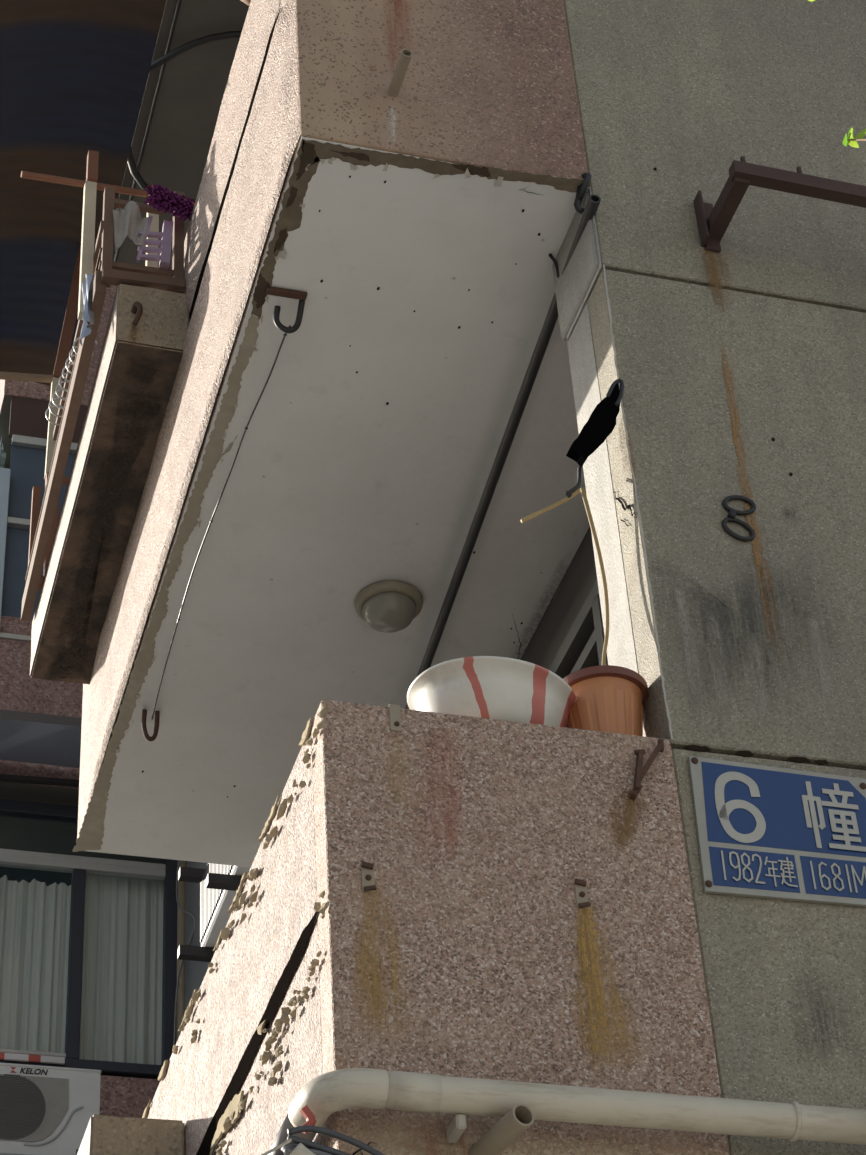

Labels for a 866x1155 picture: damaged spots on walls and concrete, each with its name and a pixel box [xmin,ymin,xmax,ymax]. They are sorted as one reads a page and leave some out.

peeling [73,139,584,852]
spalling [208,868,259,974]
spalling [313,890,327,919]
spalling [158,989,201,1081]
crack [196,912,318,1155]
spalling [208,950,322,1155]